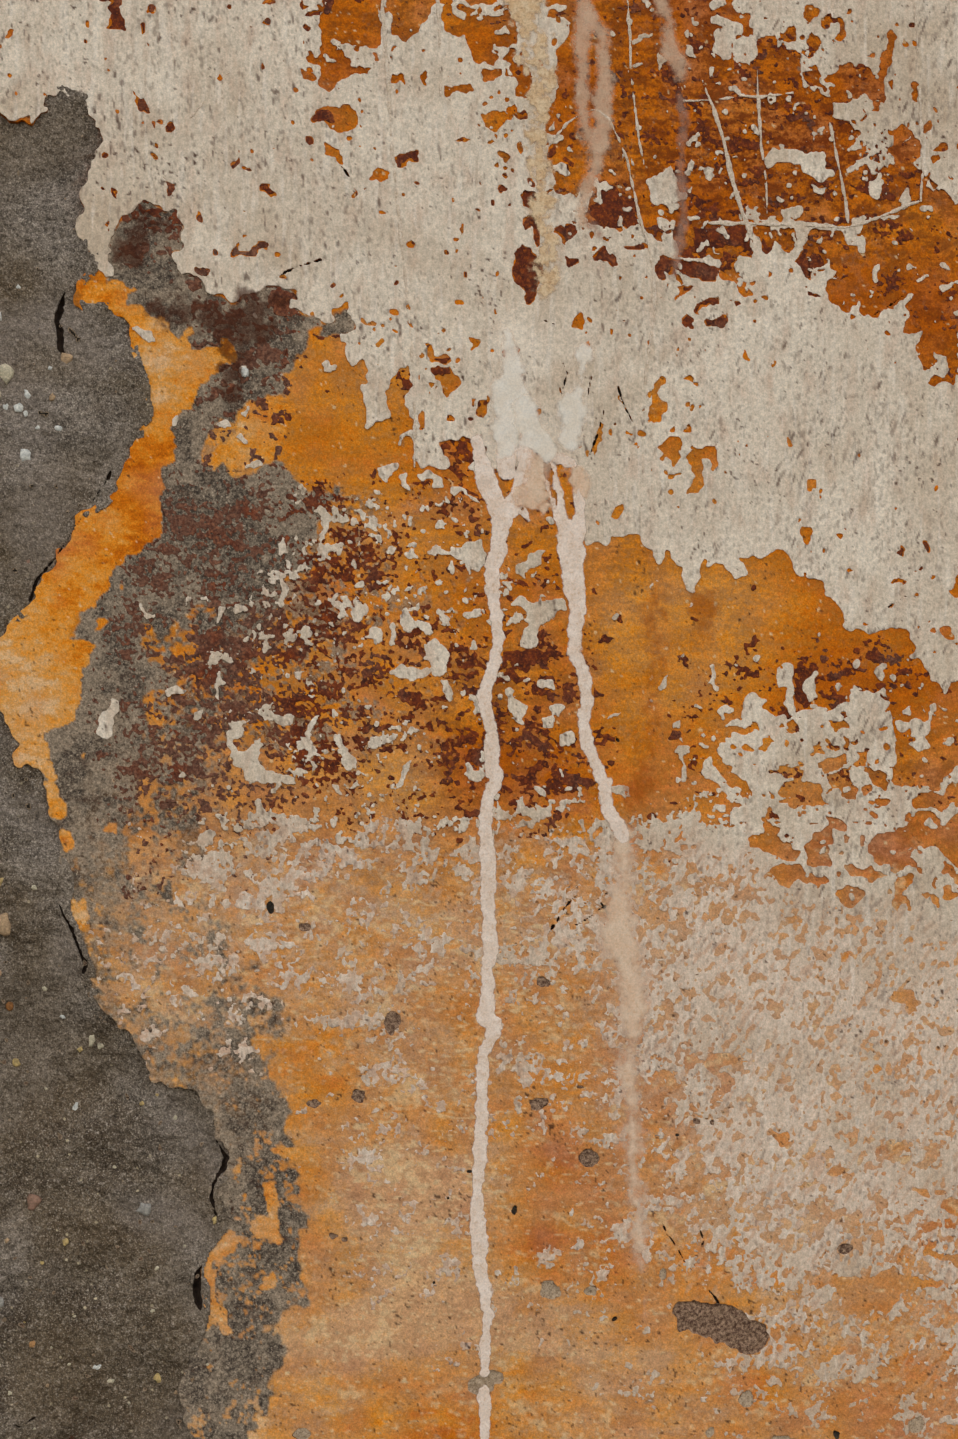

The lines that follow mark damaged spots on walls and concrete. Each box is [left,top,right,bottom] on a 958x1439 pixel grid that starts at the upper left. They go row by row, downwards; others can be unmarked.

peeling [99,0,156,46]
peeling [291,0,958,387]
crack [54,293,65,354]
peeling [578,376,727,508]
peeling [491,461,958,932]
spalling [0,85,493,1439]
water stain [469,329,650,1439]
spalling [537,977,550,987]
crack [209,1140,229,1215]
crack [193,1265,203,1310]
spalling [672,1291,773,1354]